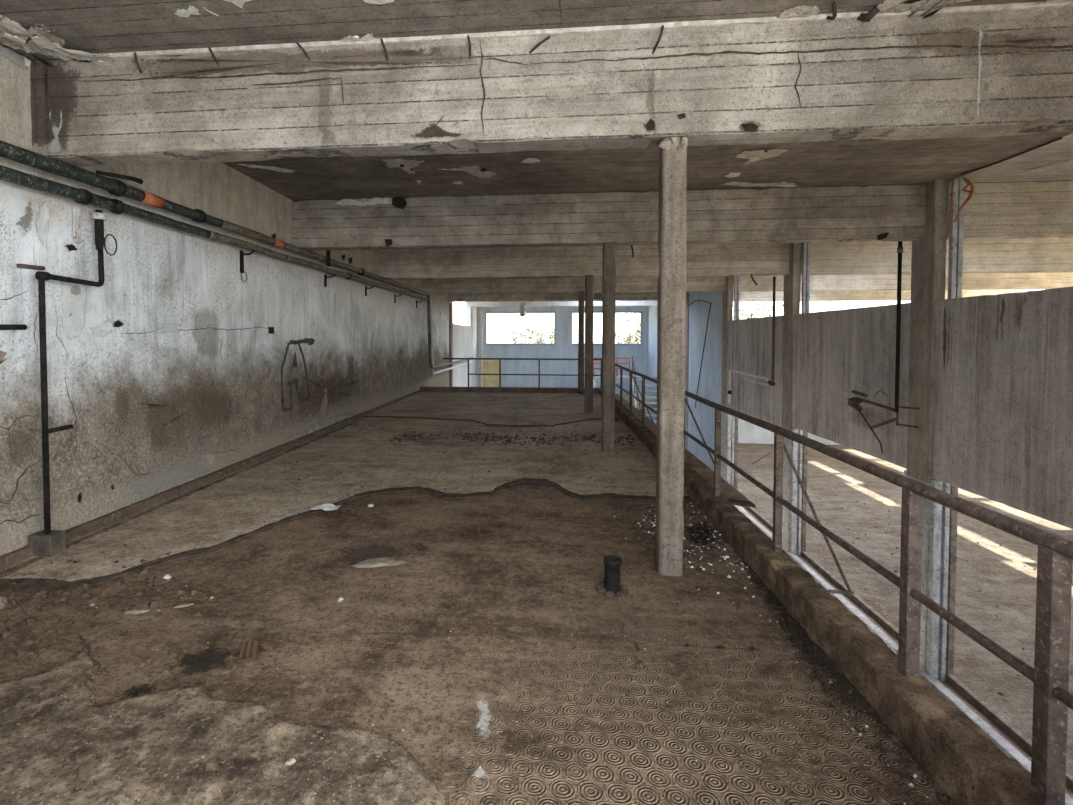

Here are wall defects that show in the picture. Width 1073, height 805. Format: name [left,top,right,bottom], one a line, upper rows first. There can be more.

peeling [175,6,219,18]
spalling [857,0,971,22]
spalling [0,14,115,69]
spalling [381,158,425,184]
spalling [442,165,498,184]
spalling [721,148,799,187]
leakage [114,342,239,451]
leakage [277,353,364,435]